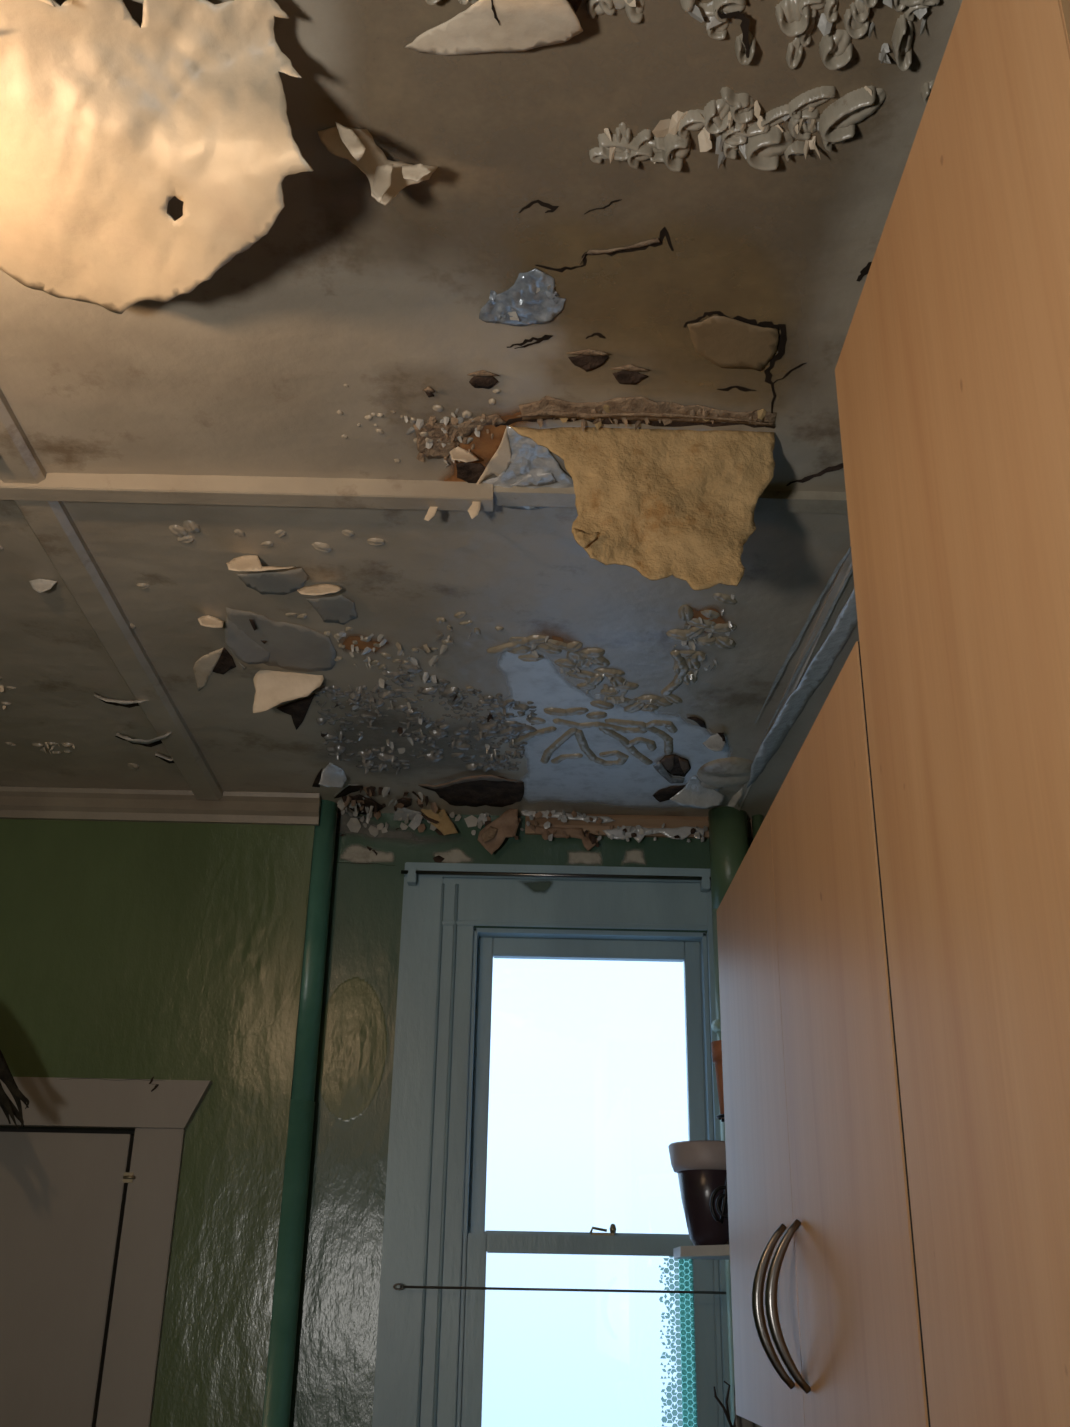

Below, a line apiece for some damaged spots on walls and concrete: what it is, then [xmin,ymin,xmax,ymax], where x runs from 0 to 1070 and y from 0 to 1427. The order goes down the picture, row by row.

peeling [404,0,583,55]
peeling [688,1,726,30]
peeling [0,0,313,314]
peeling [317,122,438,205]
crack [519,199,622,214]
crack [535,227,674,272]
peeling [413,349,777,682]
peeling [226,555,358,625]
peeling [193,615,324,730]
peeling [312,588,858,866]